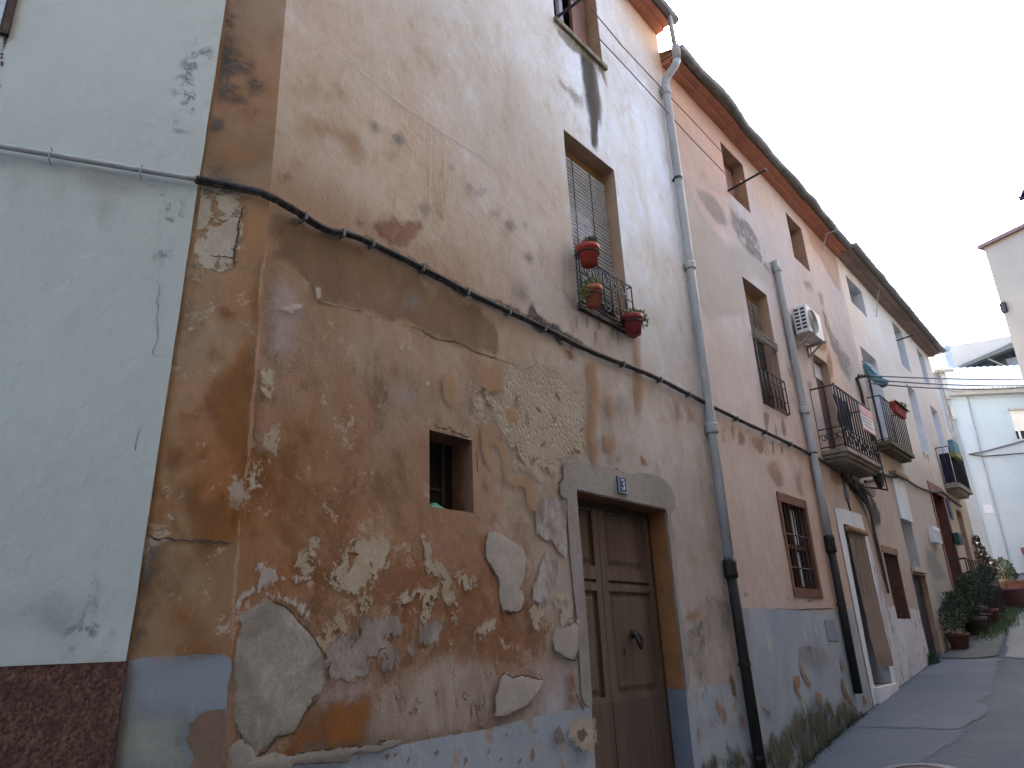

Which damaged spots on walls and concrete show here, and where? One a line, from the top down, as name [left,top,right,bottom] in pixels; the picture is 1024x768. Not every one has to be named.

water stain [557,28,607,151]
crack [211,206,244,266]
water stain [696,188,769,269]
crack [152,281,160,357]
crack [412,327,538,369]
flaking render [464,351,596,633]
crack [150,535,235,545]
peeling [294,529,479,682]
flaking render [470,618,520,652]